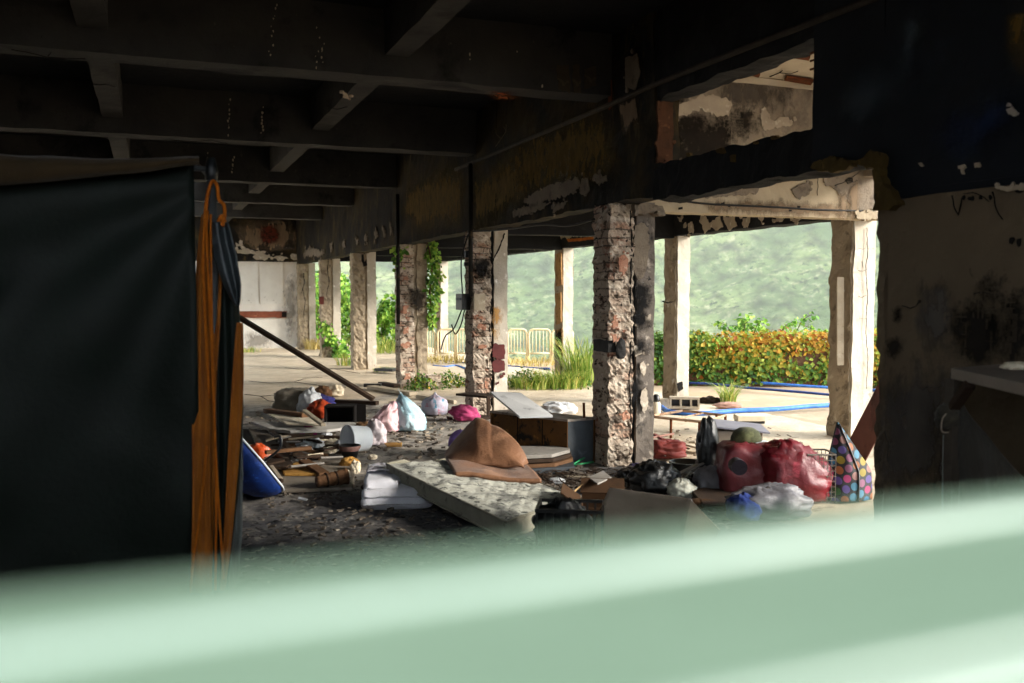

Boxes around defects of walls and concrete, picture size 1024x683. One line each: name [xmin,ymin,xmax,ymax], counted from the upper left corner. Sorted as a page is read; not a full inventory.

spalling [784,51,814,85]
flaking render [654,94,732,163]
peeling [753,107,797,144]
peeling [512,169,607,218]
peeling [617,149,905,281]
peeling [235,221,393,267]
flaking render [610,315,619,343]
mould [951,276,1024,366]
peeling [478,343,505,389]